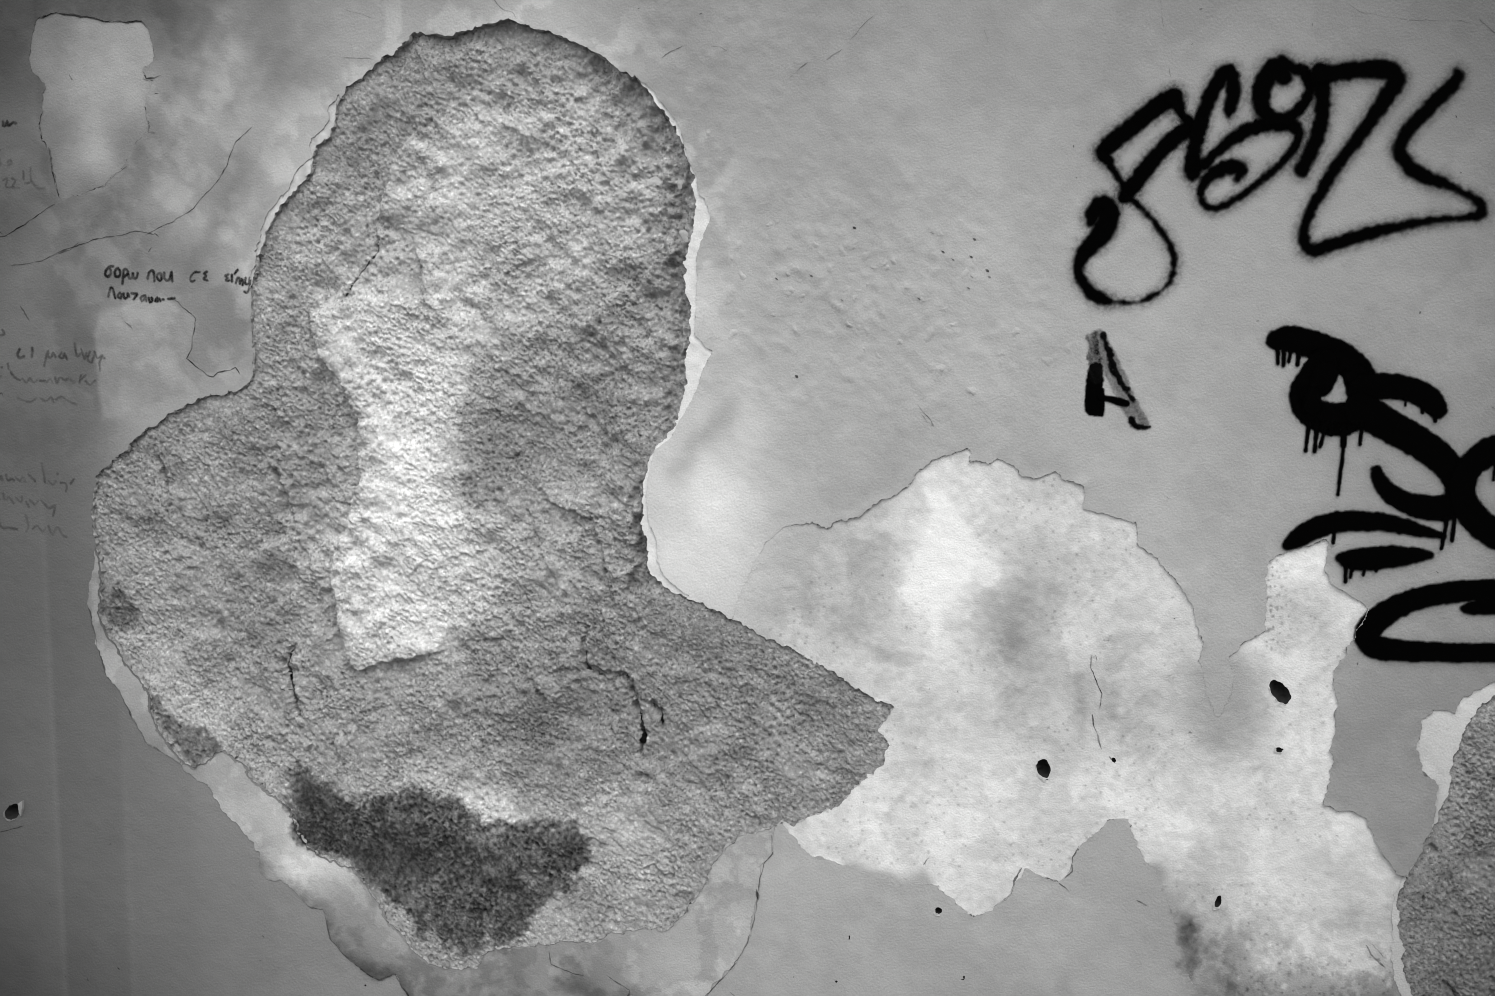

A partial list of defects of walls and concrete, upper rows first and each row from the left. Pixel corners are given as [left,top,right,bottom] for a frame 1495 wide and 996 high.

crack [0,124,59,265]
peeling [29,12,154,199]
crack [62,127,252,251]
spalling [87,18,894,996]
crack [639,703,664,746]
peeling [732,448,1495,996]
leakage [288,768,591,954]